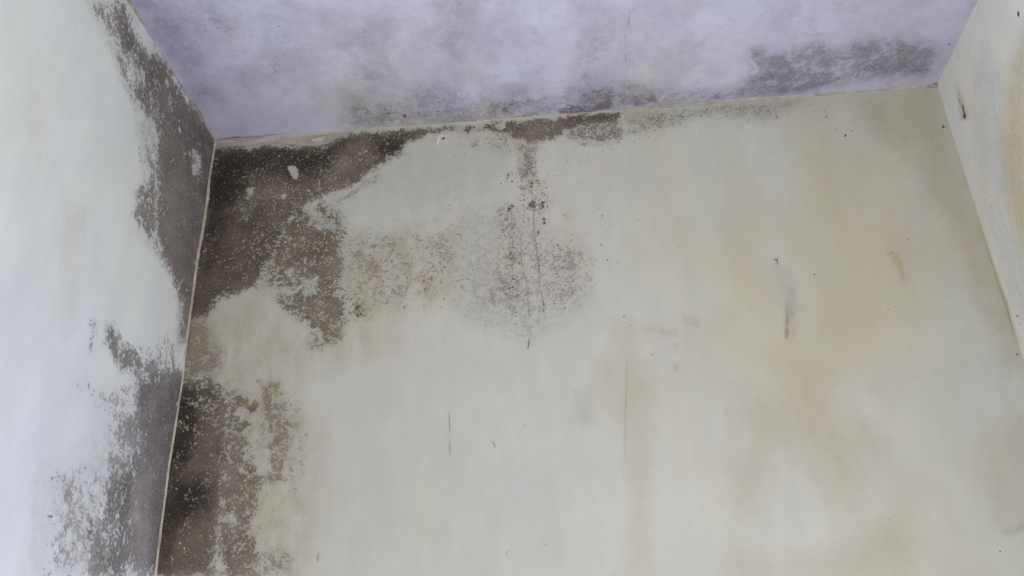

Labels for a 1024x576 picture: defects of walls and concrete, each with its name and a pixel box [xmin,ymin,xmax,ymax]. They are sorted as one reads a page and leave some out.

damp [44,0,684,576]
damp [700,33,928,123]